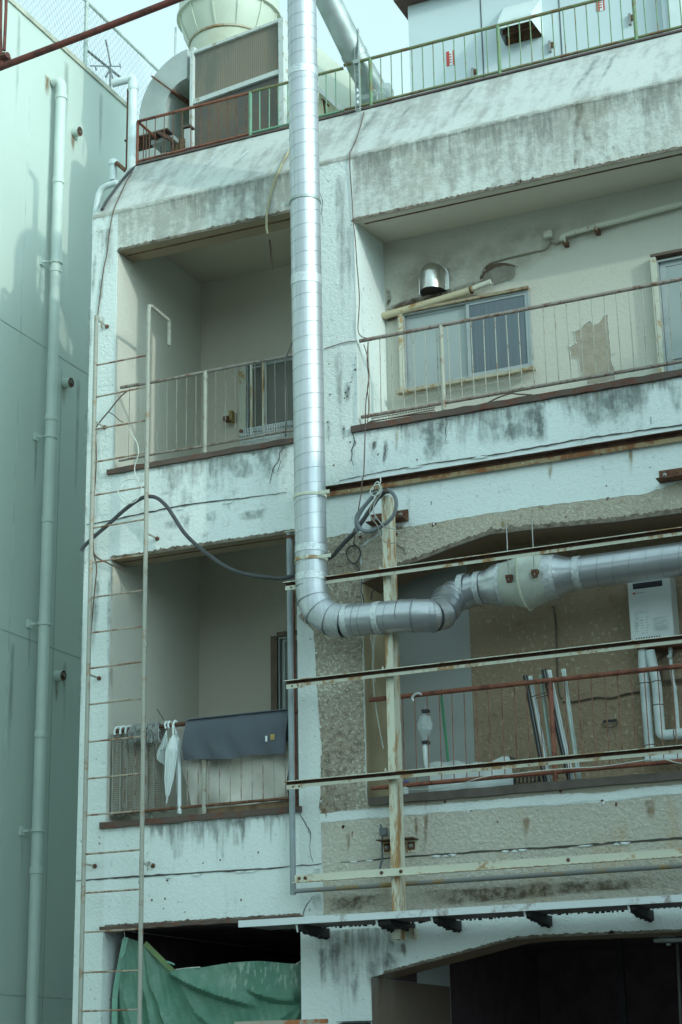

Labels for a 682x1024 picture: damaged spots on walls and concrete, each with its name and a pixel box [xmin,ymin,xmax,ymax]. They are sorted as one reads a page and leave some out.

peeling [569,313,616,385]